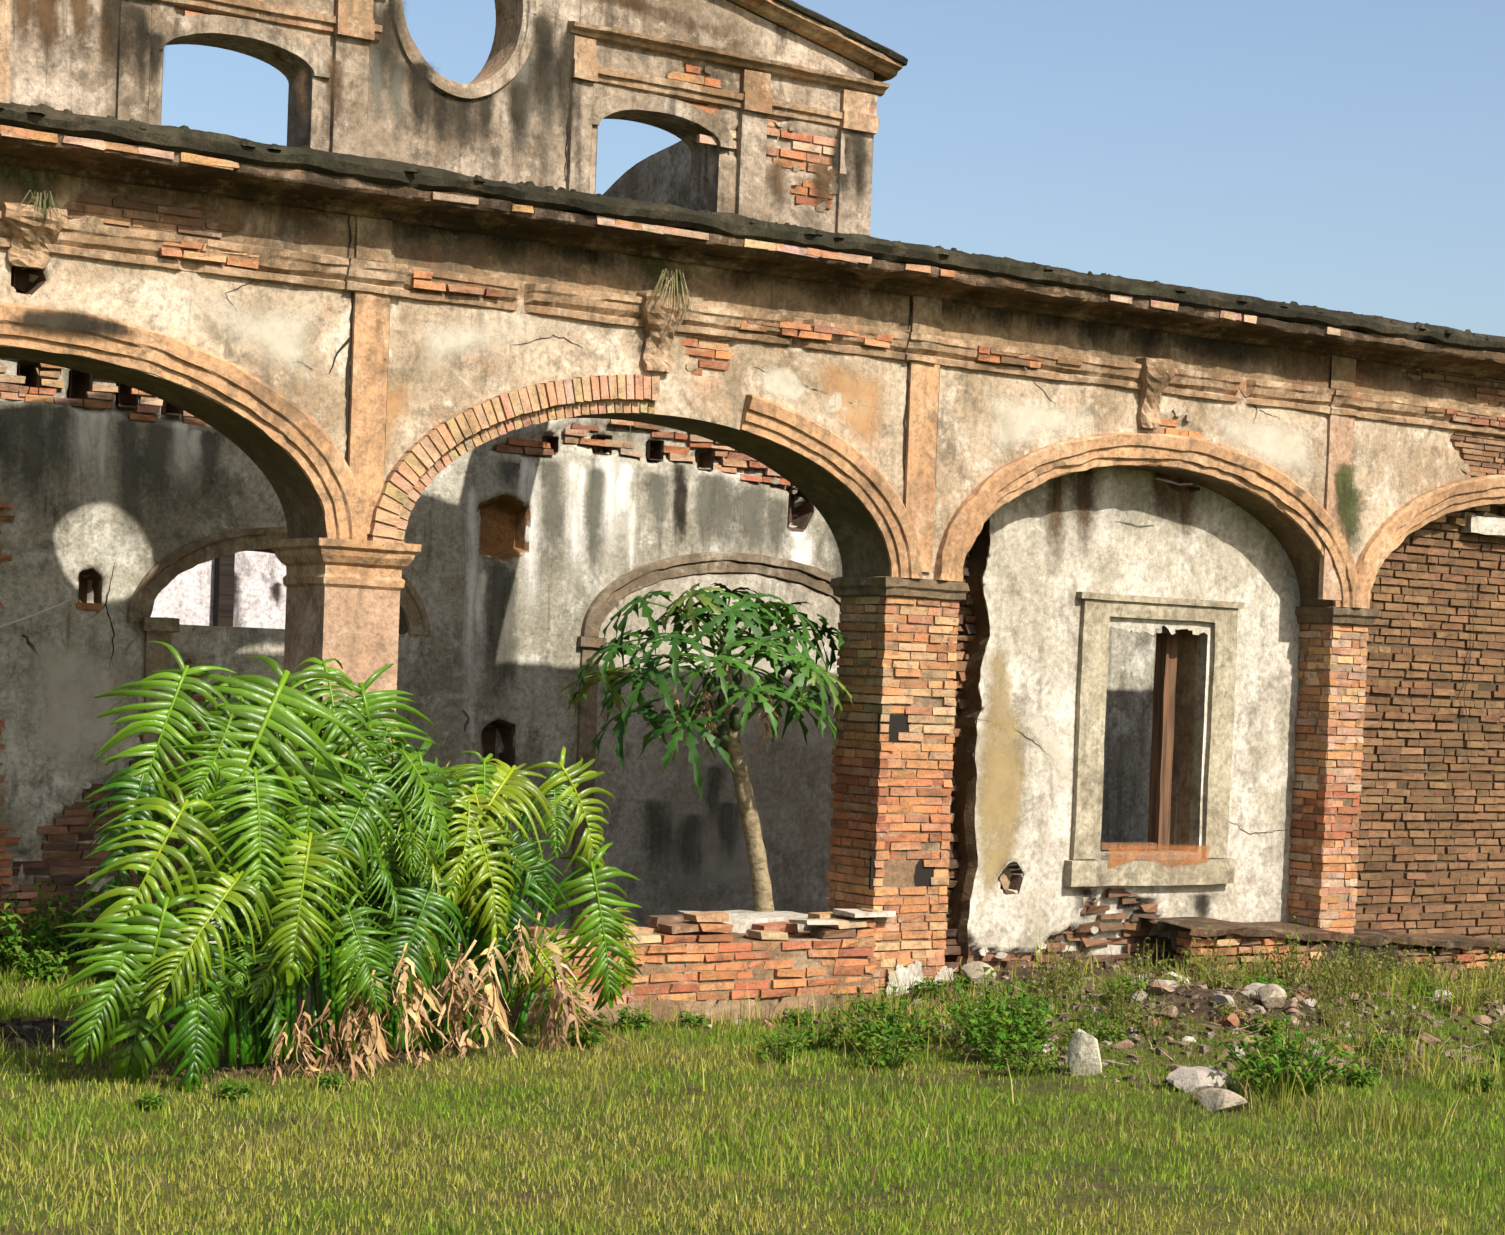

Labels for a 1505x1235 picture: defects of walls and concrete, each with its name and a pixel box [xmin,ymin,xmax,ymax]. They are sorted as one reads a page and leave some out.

damp [14,0,164,74]
spalling [766,115,839,212]
spalling [0,363,163,422]
spalling [495,419,797,494]
damp [1048,468,1095,536]
damp [1154,473,1194,528]
damp [1336,474,1362,540]
spalling [1408,371,1505,476]
damp [465,458,812,686]
spalling [0,671,208,958]
damp [980,655,1022,886]
spalling [914,518,1193,976]